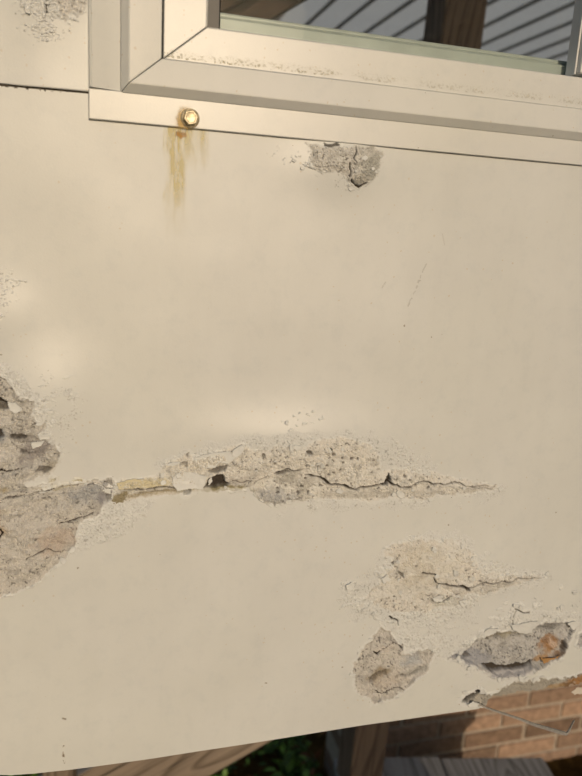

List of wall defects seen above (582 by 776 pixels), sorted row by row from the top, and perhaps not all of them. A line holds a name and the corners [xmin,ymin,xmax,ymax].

peeling [12,0,89,45]
corrosion [169,109,187,169]
spalling [266,140,386,192]
peeling [0,362,507,599]
peeling [336,528,582,708]